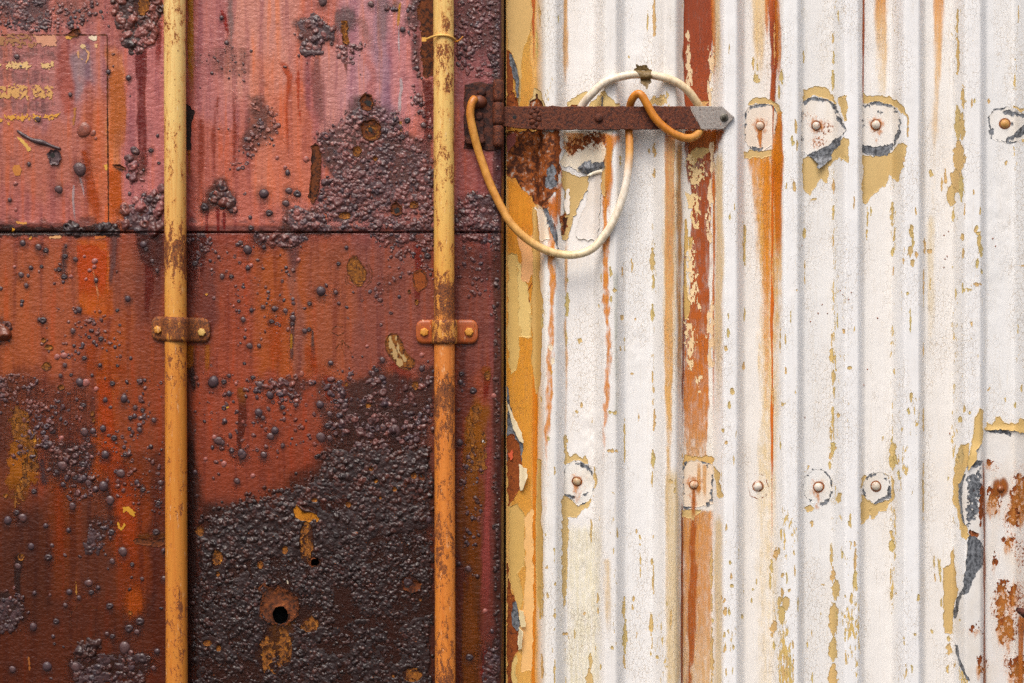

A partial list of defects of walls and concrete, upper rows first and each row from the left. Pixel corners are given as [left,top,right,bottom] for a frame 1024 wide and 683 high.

corrosion [0,296,165,567]
corrosion [69,577,160,683]
corrosion [186,0,435,683]
peeling [506,0,541,105]
peeling [507,404,598,683]
peeling [506,131,621,402]
corrosion [664,129,724,683]
corrosion [682,0,719,107]
corrosion [749,0,783,477]
peeling [744,23,849,220]
peeling [853,92,909,209]
peeling [943,385,1024,683]